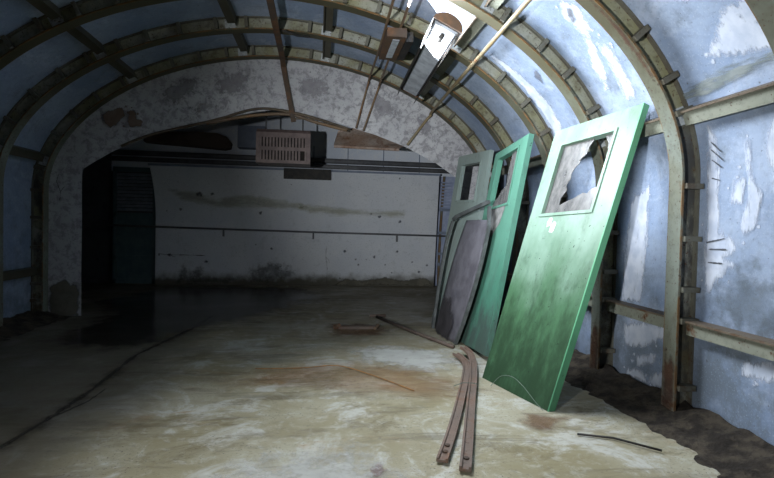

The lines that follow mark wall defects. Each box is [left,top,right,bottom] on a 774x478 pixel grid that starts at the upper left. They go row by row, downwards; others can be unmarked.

peeling [704,0,771,64]
peeling [766,119,774,168]
peeling [742,361,774,386]